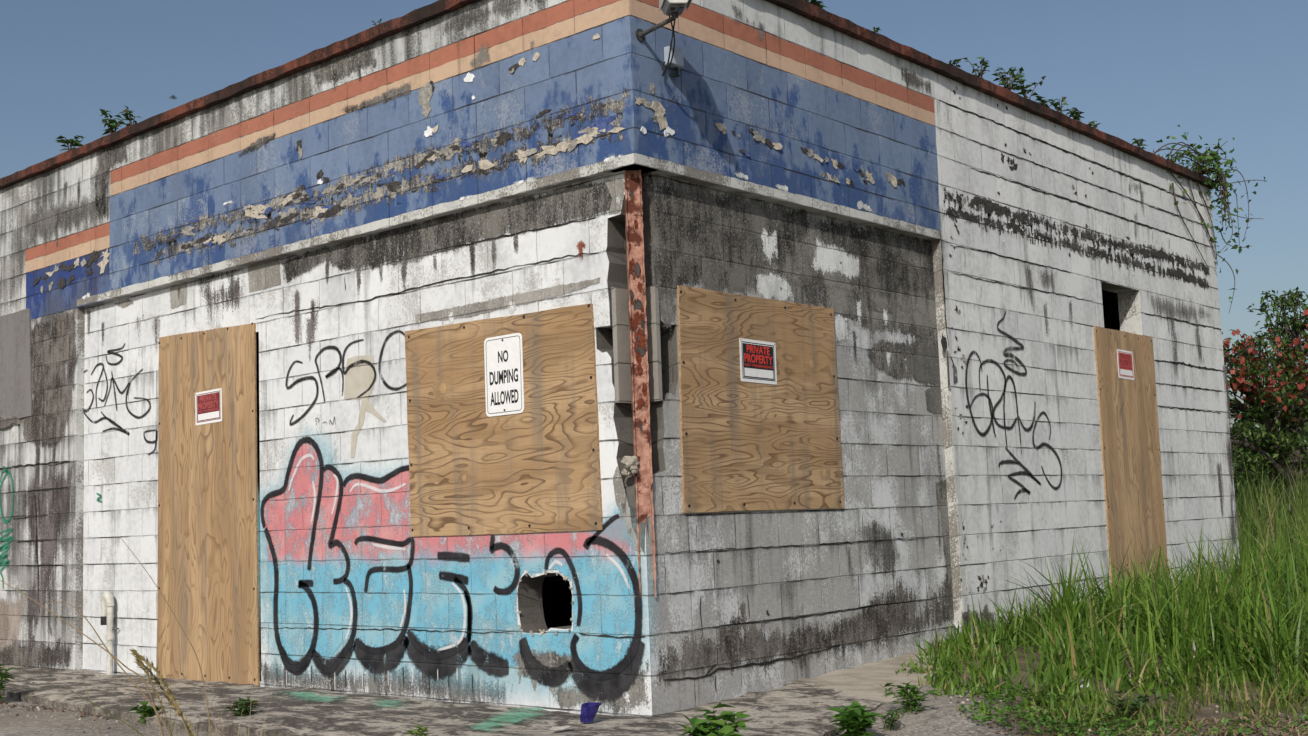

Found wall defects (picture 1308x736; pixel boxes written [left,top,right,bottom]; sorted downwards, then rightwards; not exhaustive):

peeling [22,293,104,502]
peeling [33,248,111,293]
peeling [133,81,675,266]
peeling [415,278,600,325]
corrosion [629,190,647,430]
water stain [655,179,934,339]
peeling [643,147,971,435]
water stain [1024,266,1055,333]
peeling [942,187,1210,291]
water stain [0,463,75,669]
peeling [512,570,654,715]
water stain [654,445,996,690]